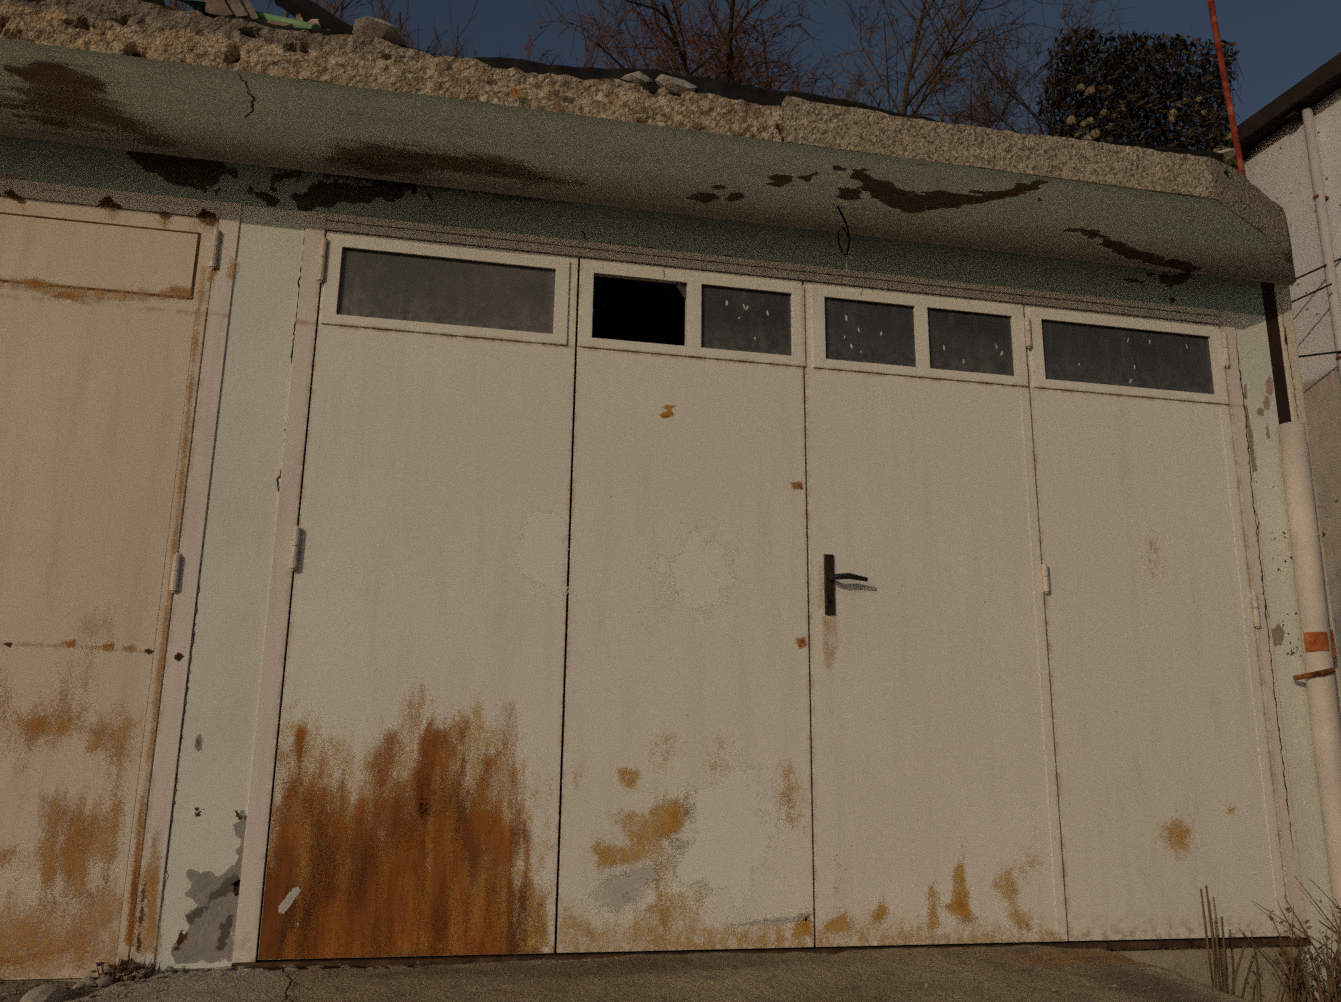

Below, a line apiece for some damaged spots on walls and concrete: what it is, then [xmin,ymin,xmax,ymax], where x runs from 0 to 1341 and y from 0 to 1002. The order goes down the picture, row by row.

damp [0,61,187,157]
peeling [126,150,572,212]
peeling [687,185,744,203]
peeling [767,166,1048,213]
peeling [1064,227,1202,303]
rust [0,259,236,977]
rust [258,689,1063,960]
rust [1161,820,1191,859]
peeling [170,810,247,964]
peeling [587,863,657,916]
crack [281,964,312,1002]